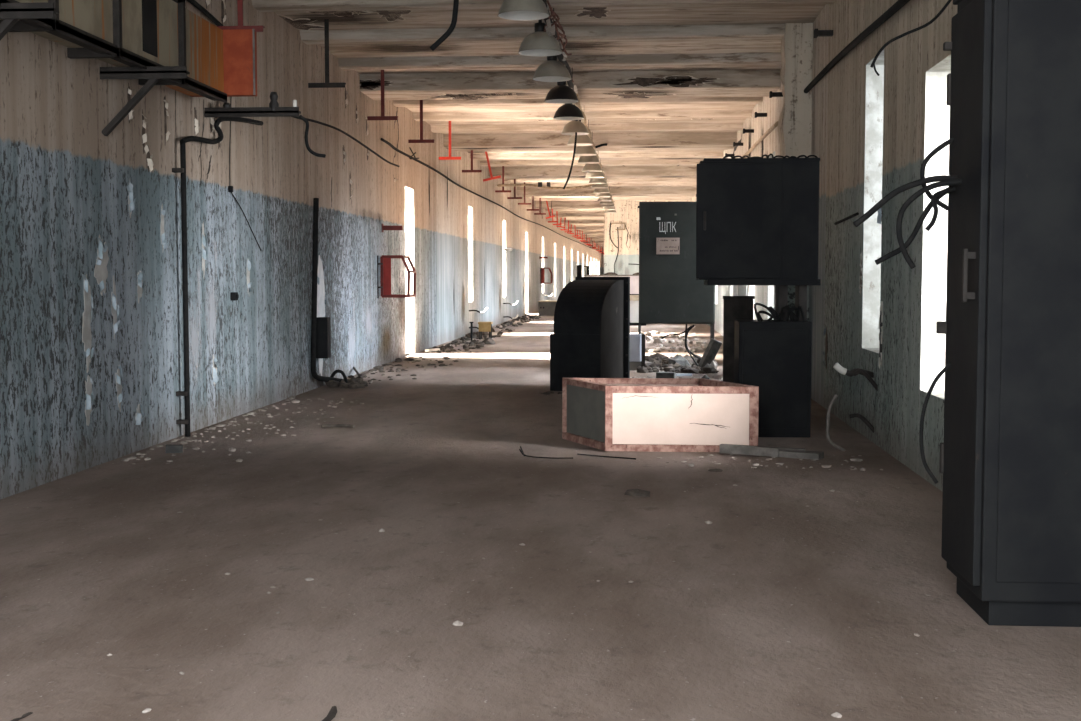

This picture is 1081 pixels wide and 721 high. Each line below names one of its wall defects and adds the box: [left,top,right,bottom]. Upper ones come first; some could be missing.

crack [11,712,33,721]
crack [322,706,337,721]